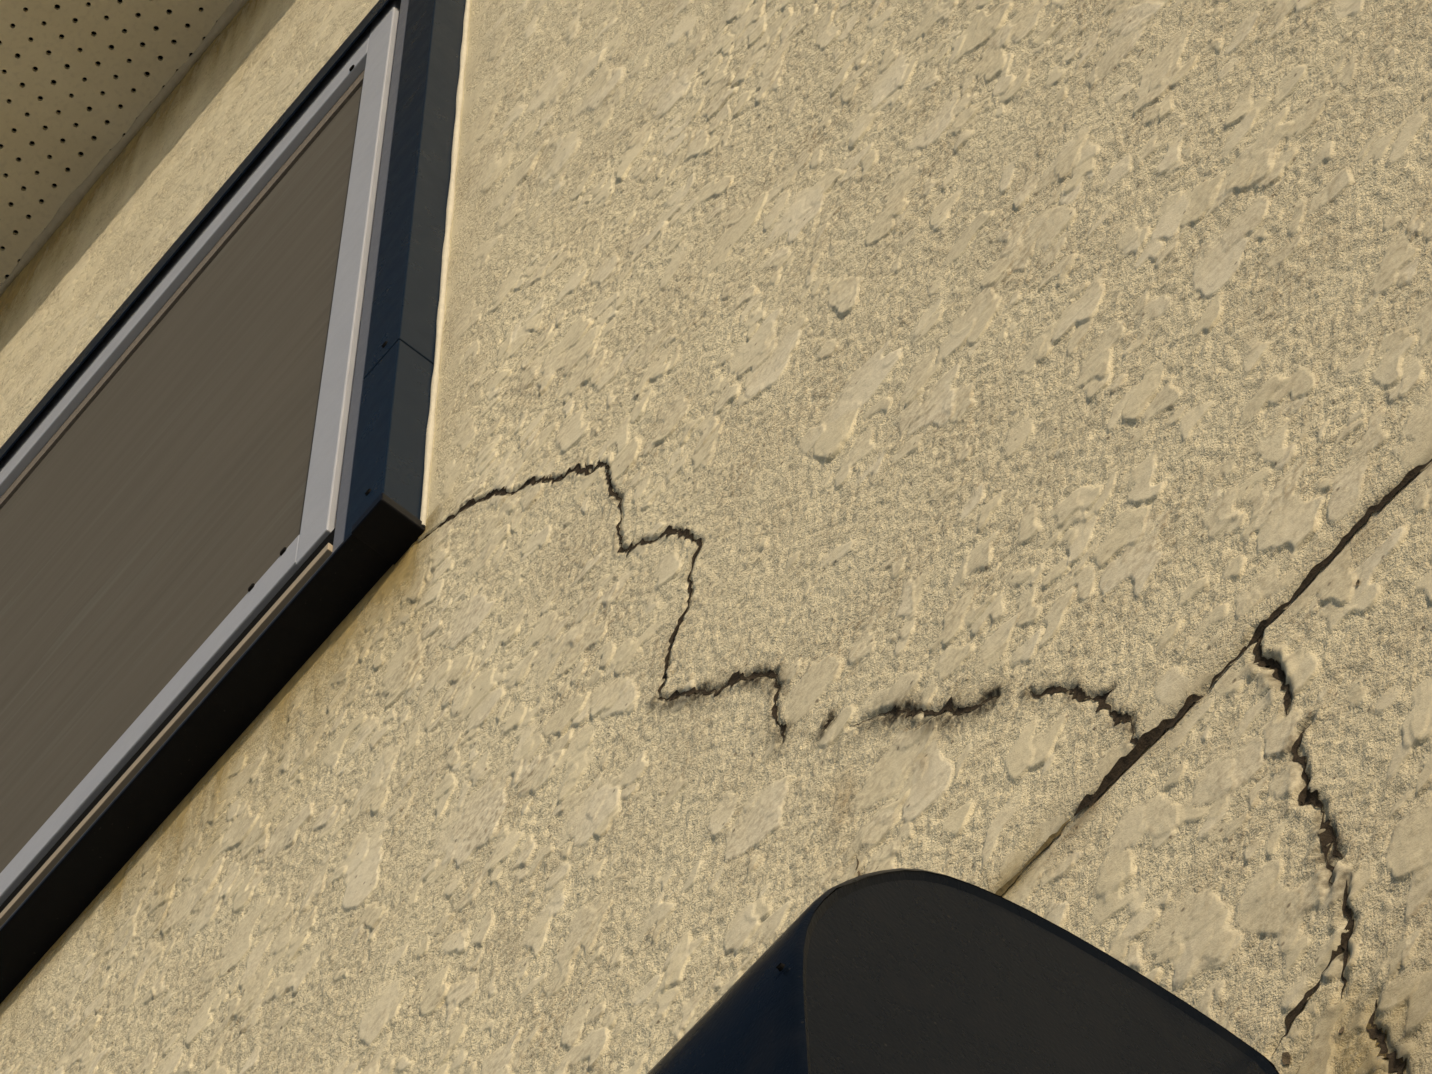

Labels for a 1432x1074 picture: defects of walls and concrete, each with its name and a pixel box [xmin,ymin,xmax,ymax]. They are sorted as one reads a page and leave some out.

crack [416,460,786,741]
crack [821,459,1432,1074]